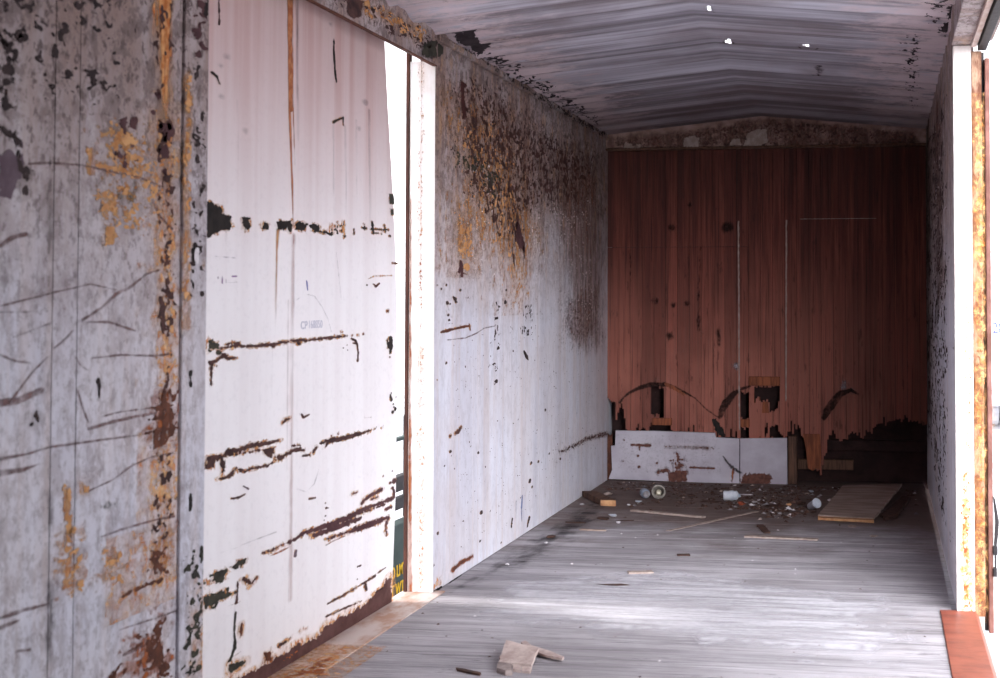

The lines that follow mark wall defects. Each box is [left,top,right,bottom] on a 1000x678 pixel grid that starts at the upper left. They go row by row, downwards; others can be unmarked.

peeling [0,0,127,111]
peeling [85,0,394,304]
peeling [329,0,914,390]
damp [561,162,599,344]
rust [105,0,180,678]
peeling [206,332,364,386]
rust [959,102,986,611]
peeling [204,427,382,480]
peeling [261,470,397,557]
peeling [656,446,715,482]
rust [238,574,394,678]
peeling [326,565,386,617]